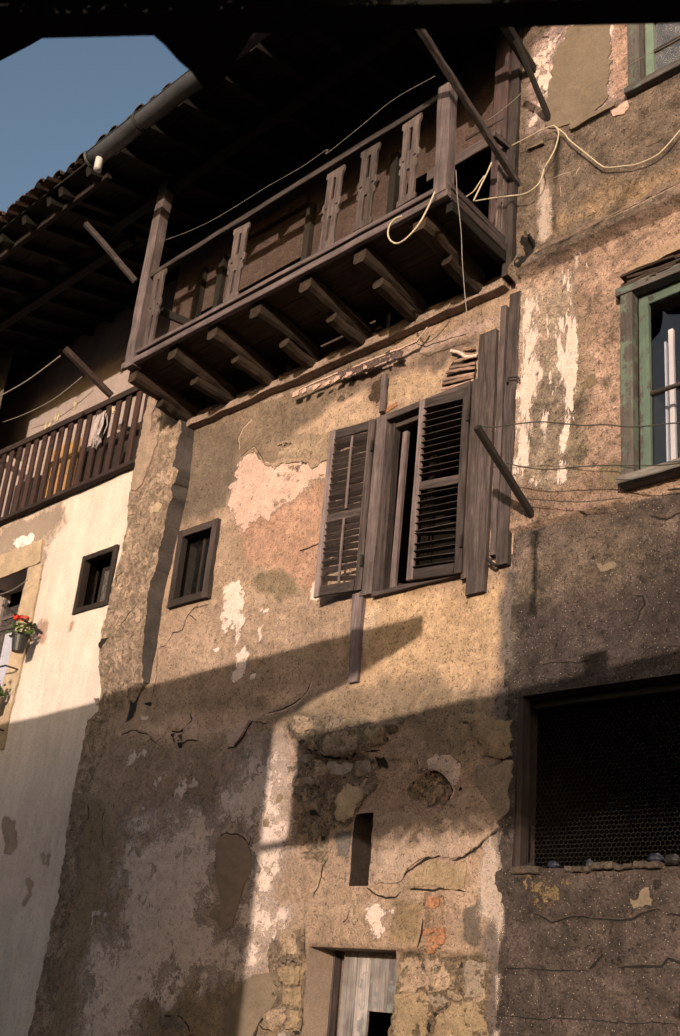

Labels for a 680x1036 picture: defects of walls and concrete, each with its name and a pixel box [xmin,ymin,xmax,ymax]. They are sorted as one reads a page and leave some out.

peeling [527,138,545,151]
peeling [528,34,565,128]
flaking render [610,100,629,117]
peeling [512,251,588,487]
flaking render [227,432,330,533]
flaking render [220,580,256,683]
crack [121,711,199,744]
crack [228,682,313,749]
peeling [68,735,298,1036]
peeling [365,900,396,939]